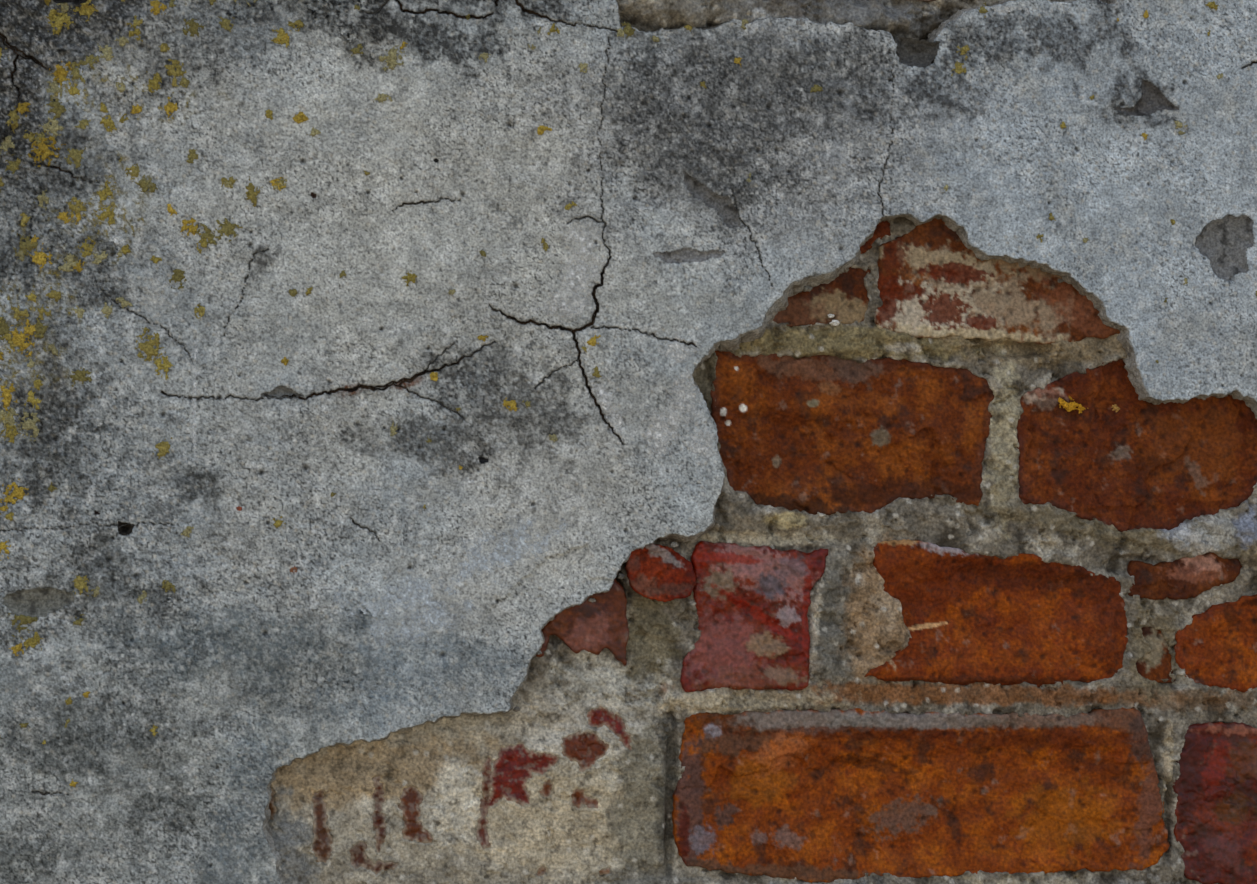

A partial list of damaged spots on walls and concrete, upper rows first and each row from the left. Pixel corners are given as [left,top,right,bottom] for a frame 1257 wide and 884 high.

crack [0,33,46,112]
peeling [261,386,304,399]
crack [161,0,697,445]
spalling [654,248,725,264]
flaking render [694,214,1257,419]
flaking render [263,456,725,884]